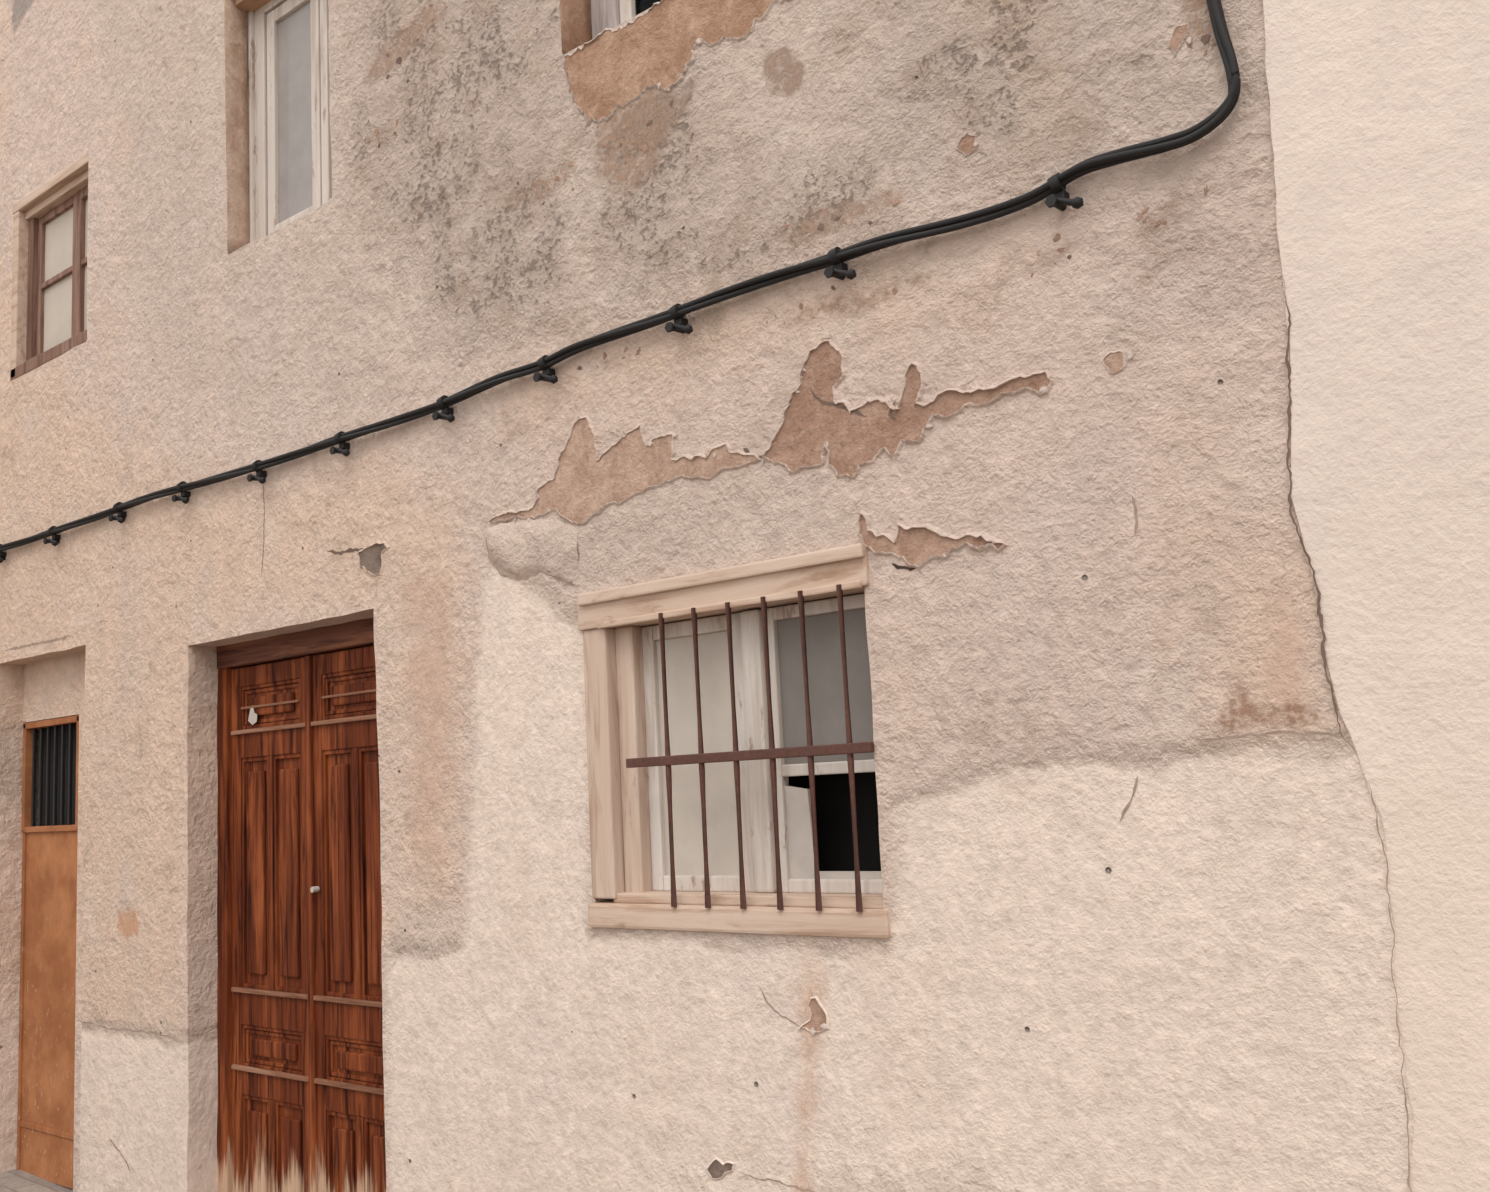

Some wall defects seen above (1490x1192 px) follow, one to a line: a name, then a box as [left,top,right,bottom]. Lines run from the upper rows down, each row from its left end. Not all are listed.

spalling [563,0,792,147]
water stain [764,47,803,94]
flaking render [489,334,1054,526]
spalling [327,540,389,577]
flaking render [857,510,1008,571]
crack [1283,279,1412,1192]
flaking render [798,996,829,1036]
crack [743,1173,814,1192]